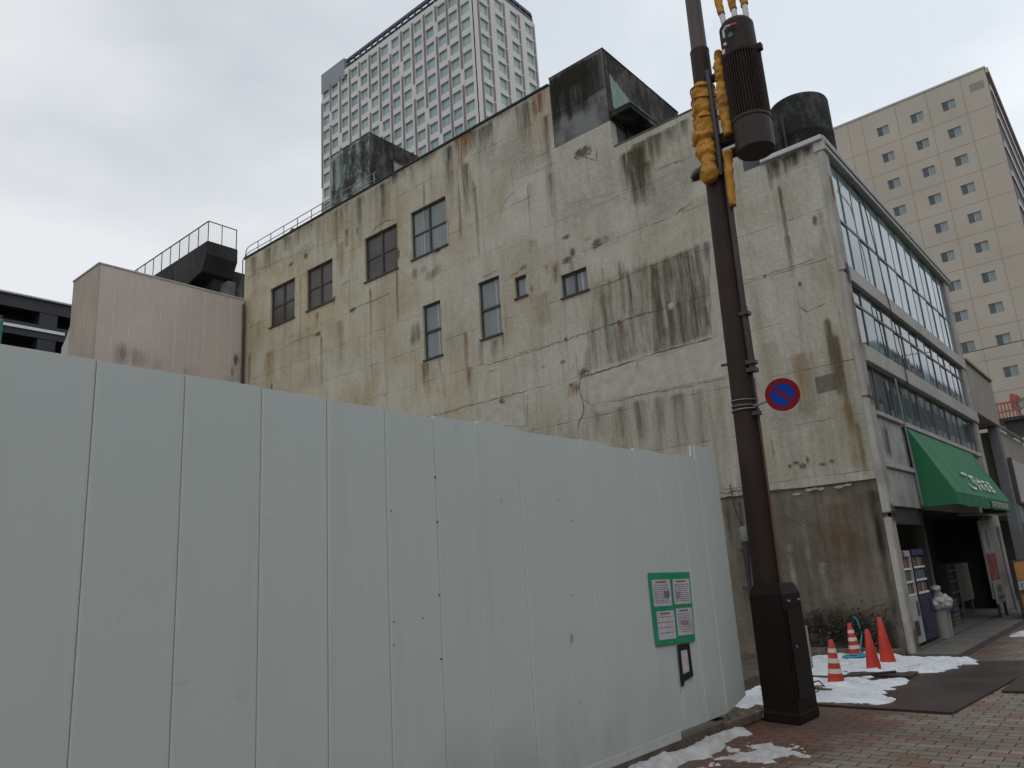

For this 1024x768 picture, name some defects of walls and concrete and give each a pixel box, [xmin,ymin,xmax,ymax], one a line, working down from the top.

water stain [623,120,685,196]
water stain [651,244,709,350]
crack [576,338,728,428]
water stain [825,320,849,411]